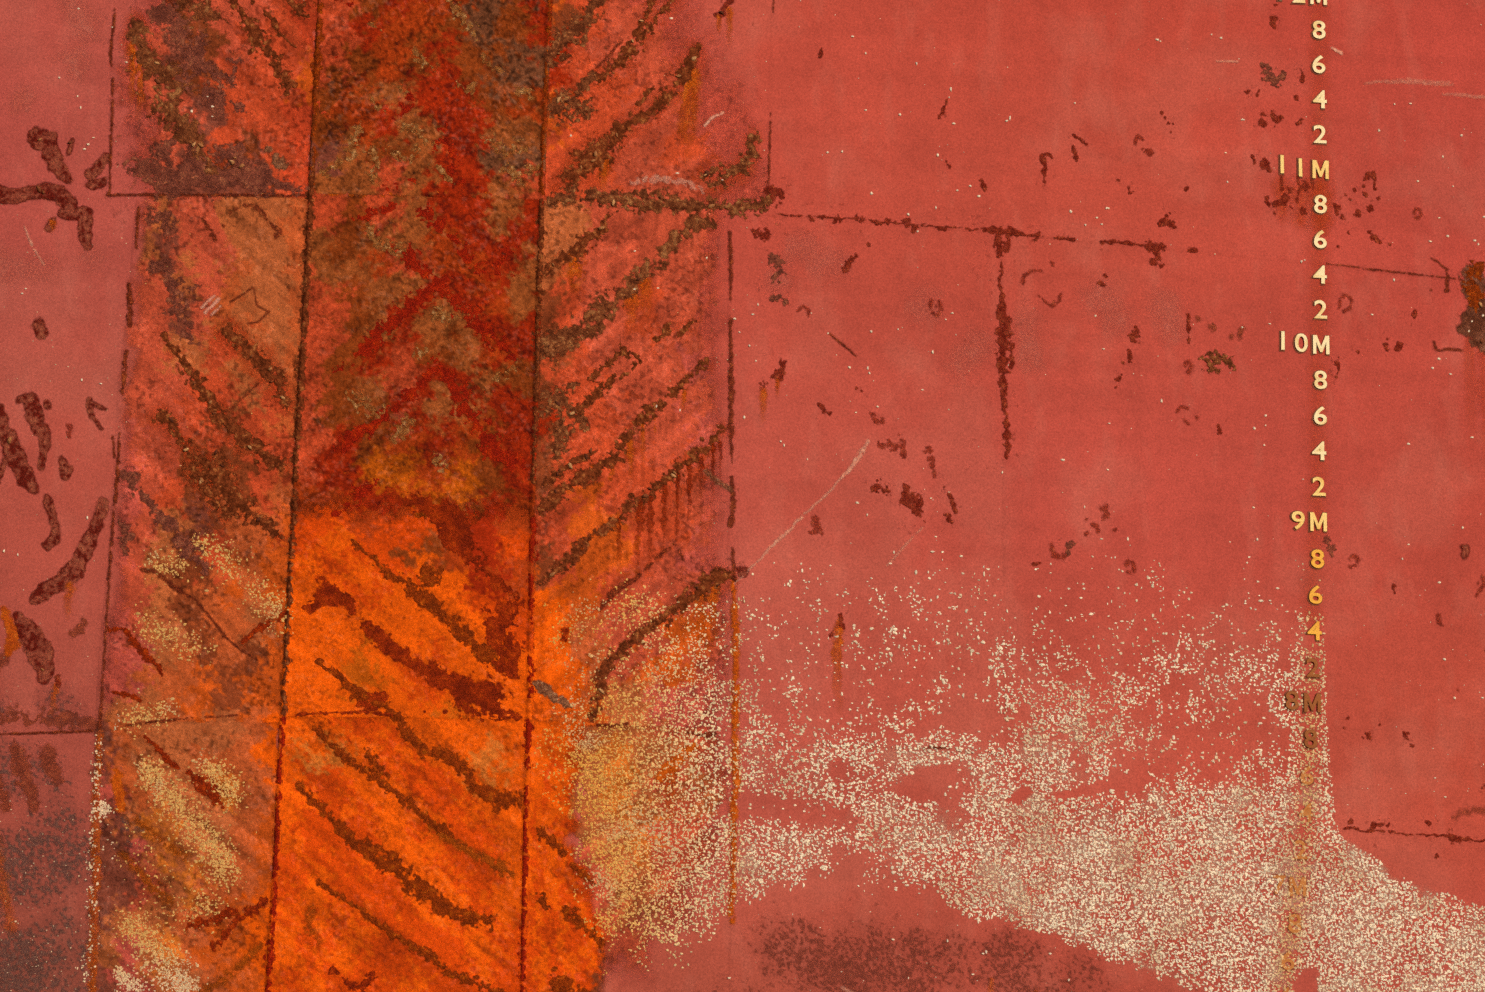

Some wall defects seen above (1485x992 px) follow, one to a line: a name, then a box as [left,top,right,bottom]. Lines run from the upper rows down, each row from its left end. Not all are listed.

corrosion [1244,62,1305,127]
corrosion [1100,212,1177,268]
corrosion [1251,154,1485,353]
corrosion [0,0,1076,992]